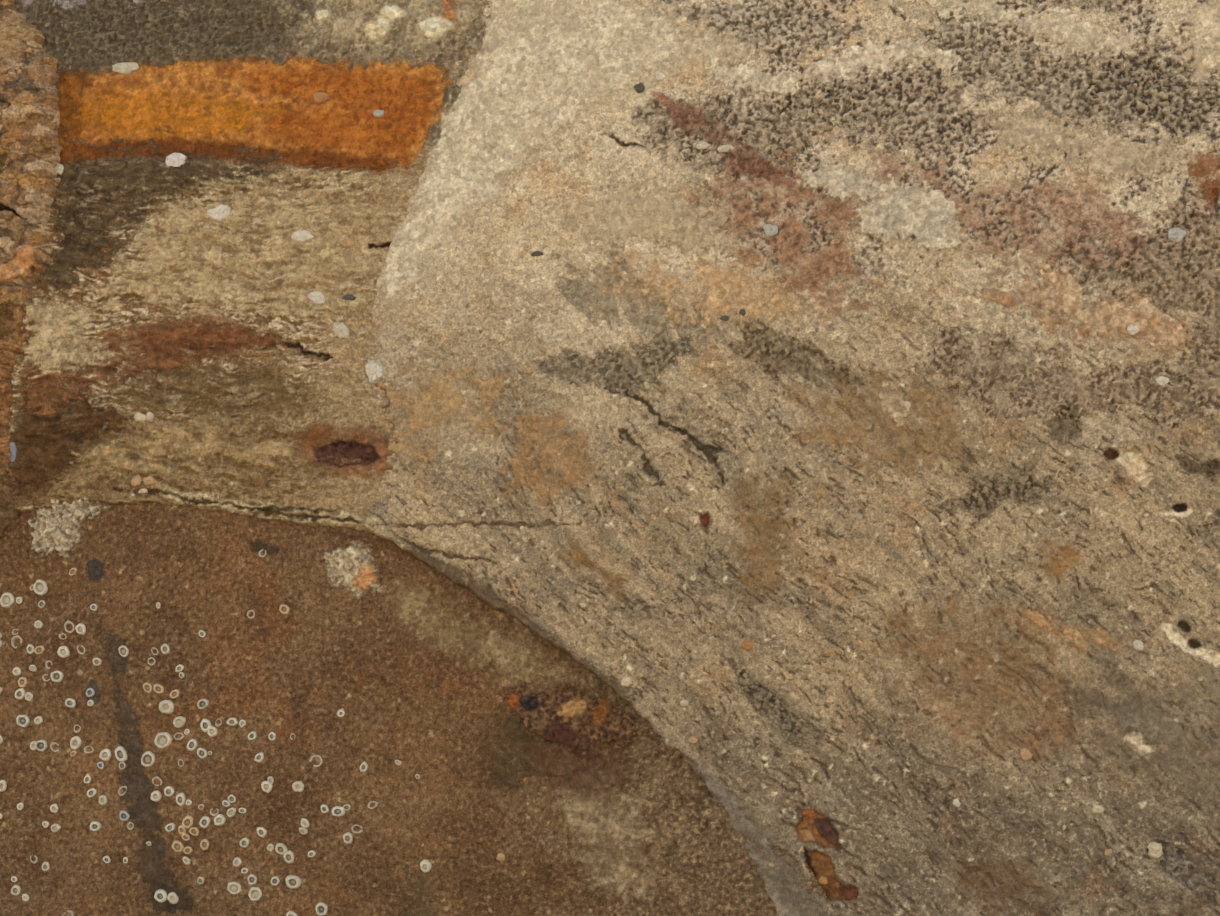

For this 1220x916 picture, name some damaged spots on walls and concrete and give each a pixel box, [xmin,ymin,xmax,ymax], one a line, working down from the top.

damp [870,0,1149,62]
corrosion [58,54,453,172]
crack [0,203,26,222]
damp [5,0,967,558]
crack [606,388,724,484]